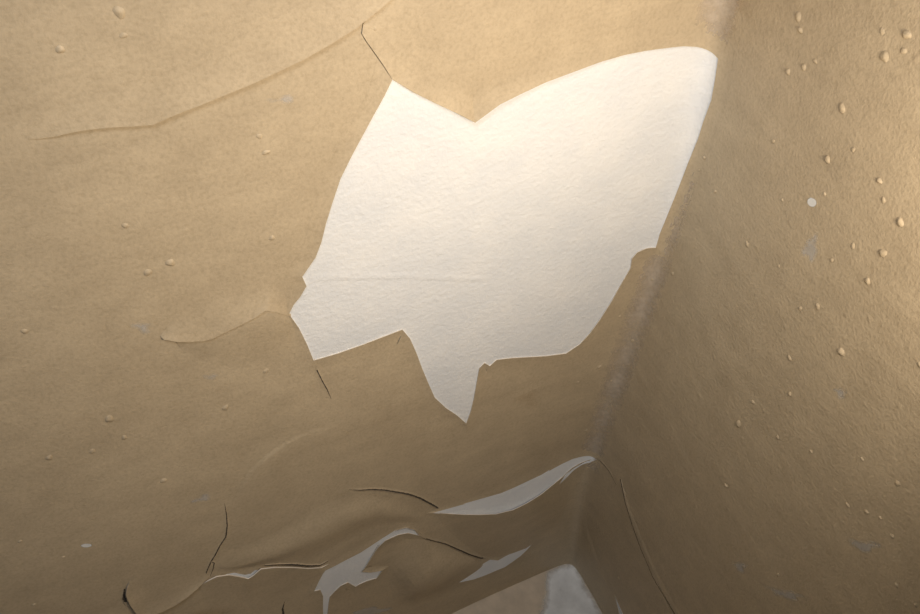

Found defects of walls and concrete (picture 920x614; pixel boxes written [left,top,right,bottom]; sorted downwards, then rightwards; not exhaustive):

peeling [21,0,390,139]
peeling [284,20,733,435]
crack [204,502,231,576]
peeling [120,448,606,614]